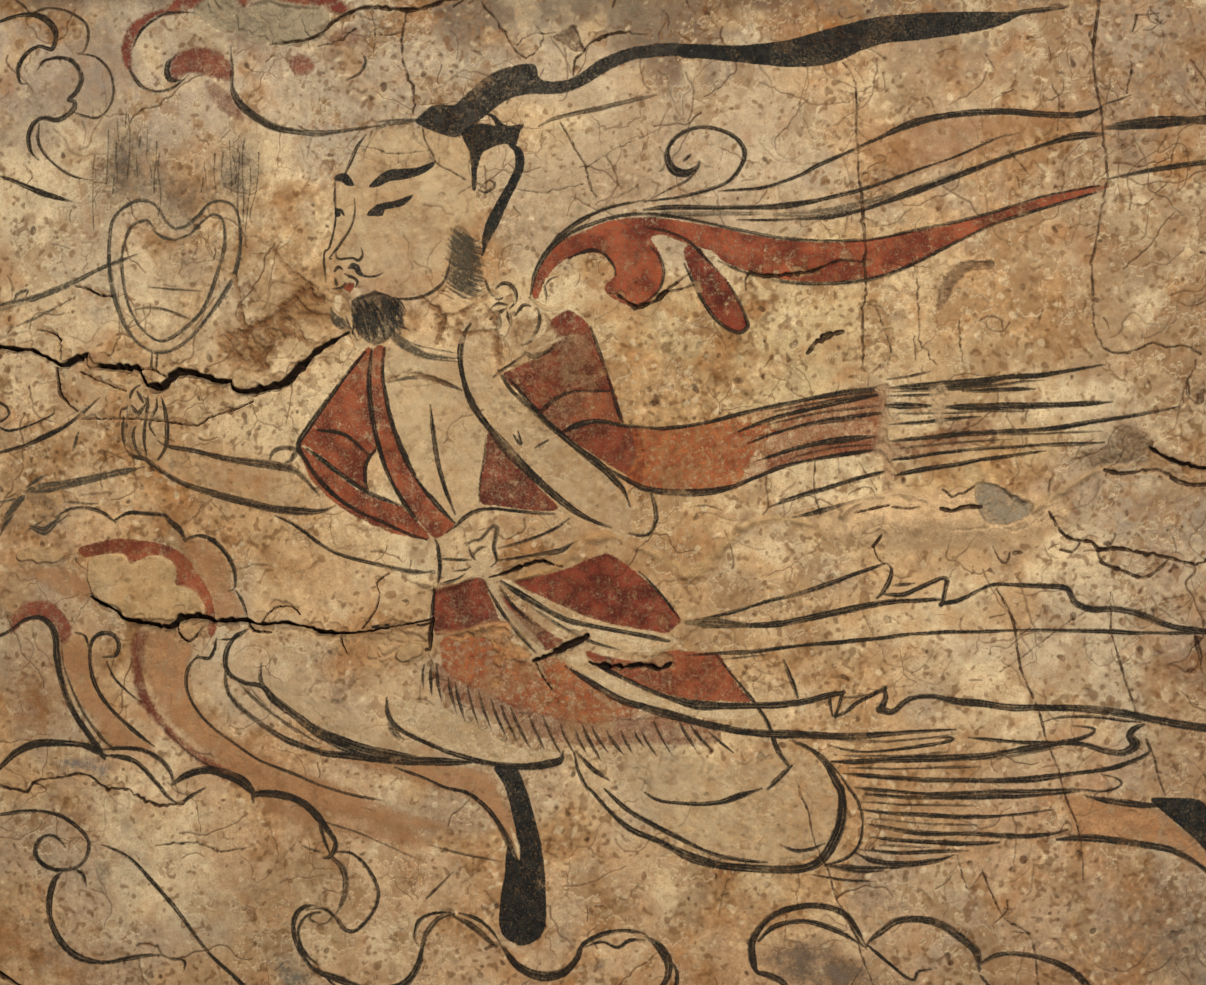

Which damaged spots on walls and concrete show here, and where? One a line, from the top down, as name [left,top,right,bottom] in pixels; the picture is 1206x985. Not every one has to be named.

crack [573,0,640,76]
crack [284,0,545,180]
crack [1089,0,1201,355]
crack [0,250,350,426]
spalling [977,483,1031,524]
crack [1103,446,1206,487]
crack [91,578,435,651]
crack [533,633,672,689]
crack [994,511,1206,880]